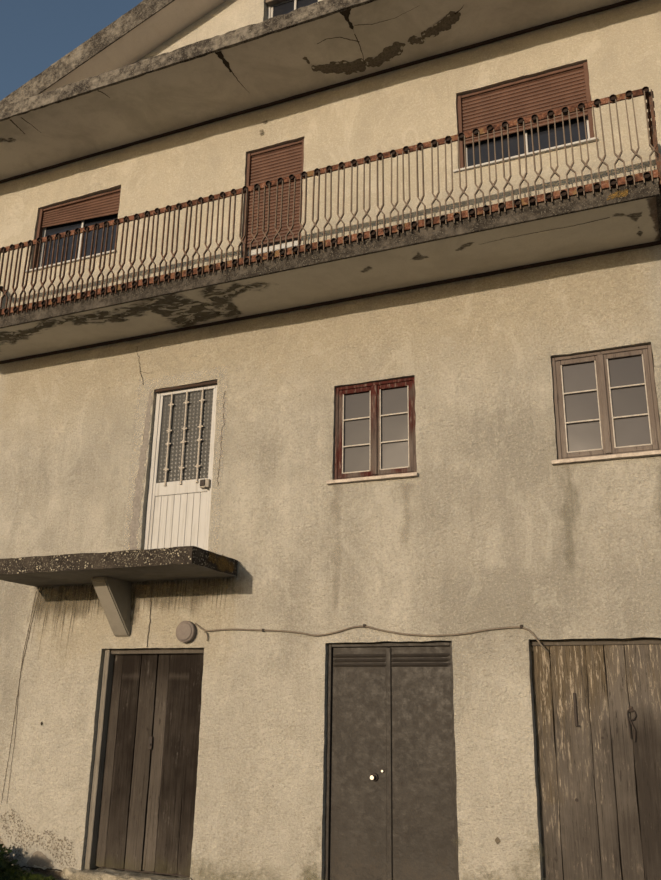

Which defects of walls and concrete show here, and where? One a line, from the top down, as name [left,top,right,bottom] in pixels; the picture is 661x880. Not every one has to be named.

crack [215,51,244,87]
crack [317,5,420,64]
peeling [303,5,464,75]
crack [217,391,226,485]
leakage [34,584,102,627]
leakage [131,577,233,620]
flaking render [0,806,77,868]